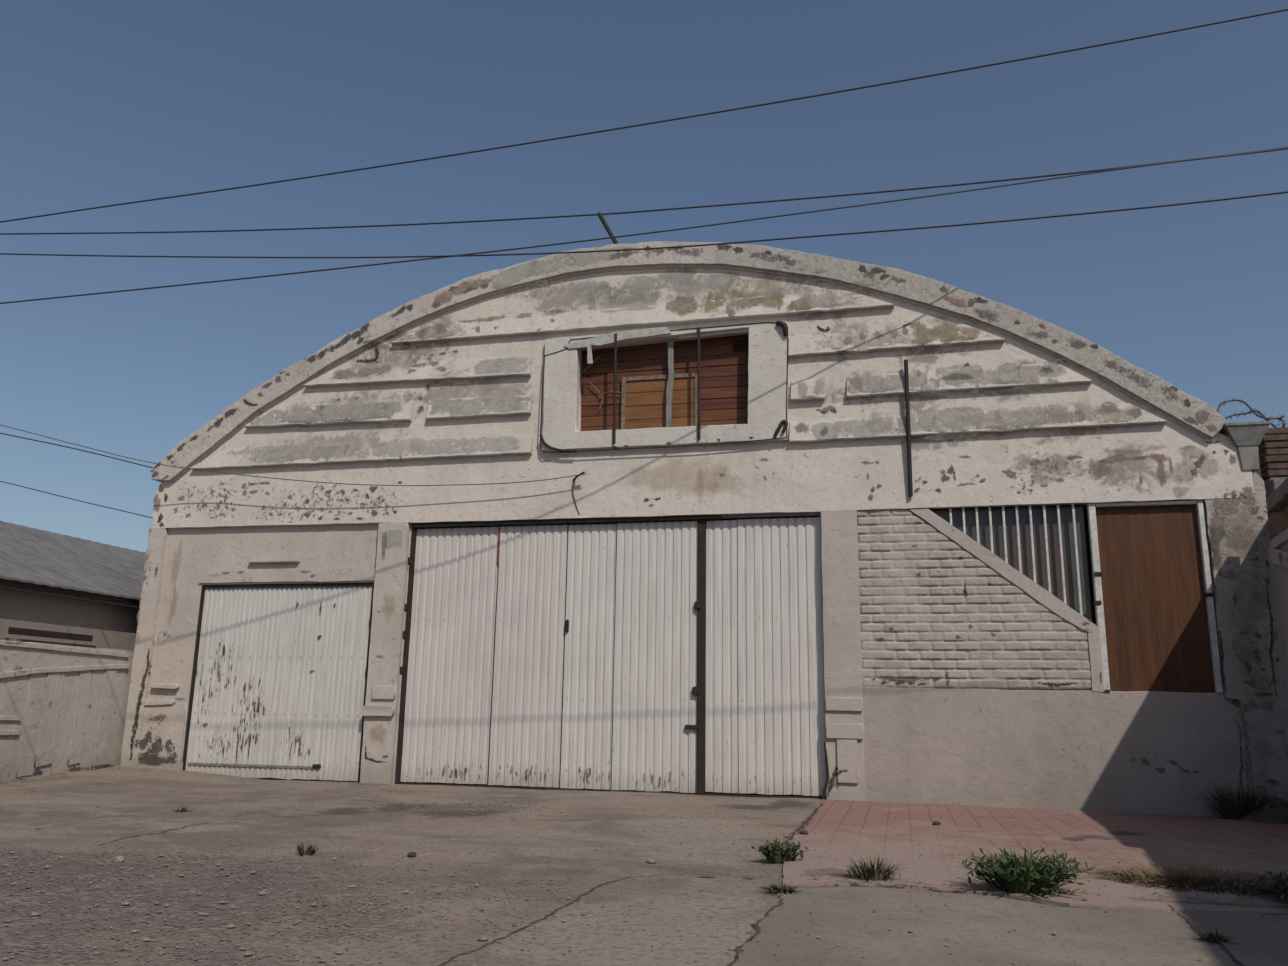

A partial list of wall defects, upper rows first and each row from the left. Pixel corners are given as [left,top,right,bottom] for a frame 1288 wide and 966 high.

peeling [430,246,621,308]
peeling [461,309,565,333]
peeling [940,285,997,320]
peeling [333,365,391,379]
peeling [848,360,1065,393]
peeling [796,377,1071,440]
spalling [1182,411,1236,479]
peeling [914,455,986,493]
peeling [1002,452,1082,494]
peeling [173,477,402,521]
damp [1209,527,1225,572]
damp [134,730,184,766]